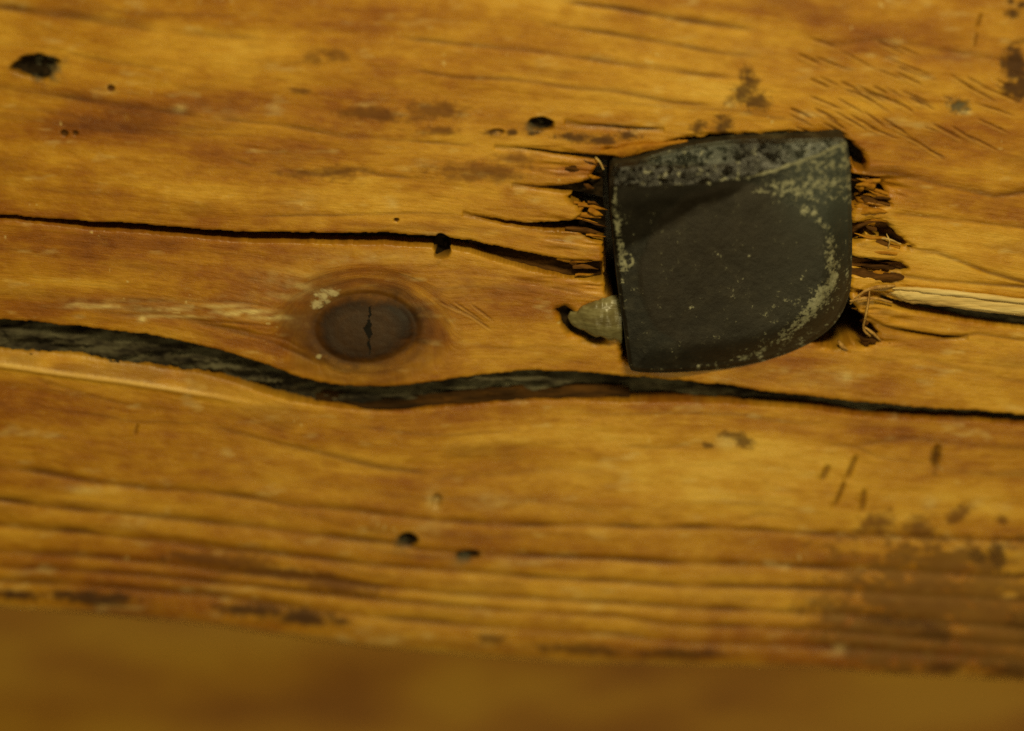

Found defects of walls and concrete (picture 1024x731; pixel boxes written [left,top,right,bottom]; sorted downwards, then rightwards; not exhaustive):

crack [266,148,612,277]
crack [363,307,372,354]
crack [0,319,1024,418]
crack [881,295,1024,334]